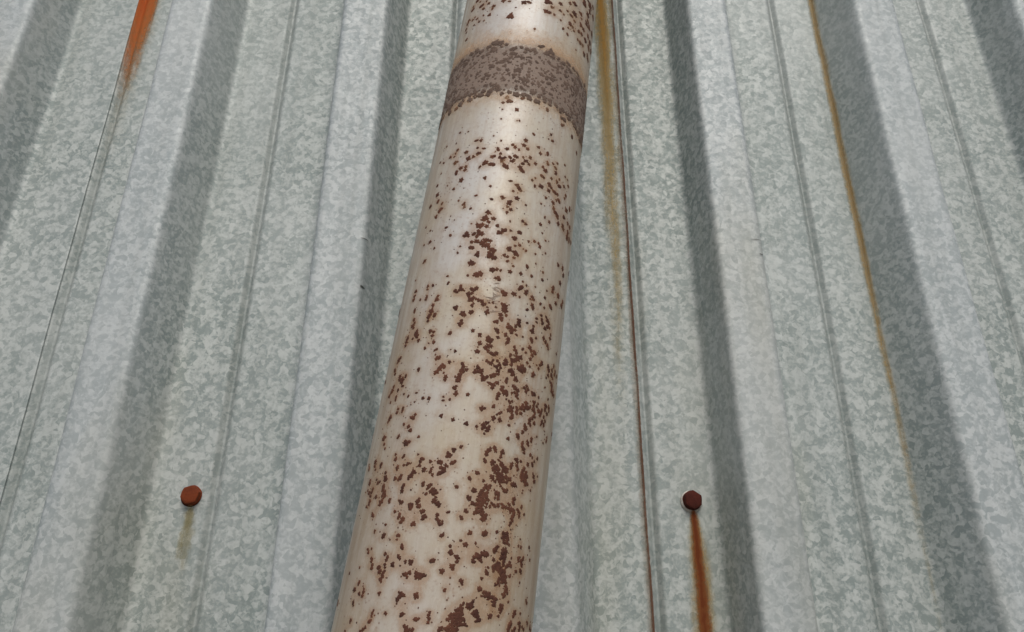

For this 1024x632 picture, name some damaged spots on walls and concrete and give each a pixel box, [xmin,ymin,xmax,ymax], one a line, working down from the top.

corrosion [124,0,158,74]
corrosion [337,0,655,632]
corrosion [809,0,900,424]
corrosion [690,510,713,632]